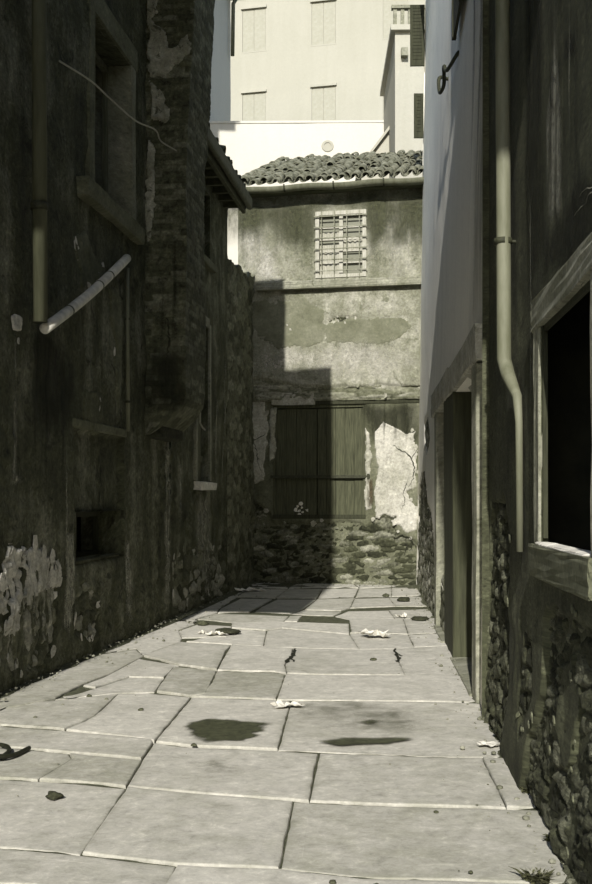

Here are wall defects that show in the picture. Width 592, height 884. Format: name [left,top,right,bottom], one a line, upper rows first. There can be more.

flaking render [146,0,192,123]
flaking render [252,380,420,484]
flaking render [253,419,445,632]
crack [393,445,418,508]
flaking render [0,535,63,678]